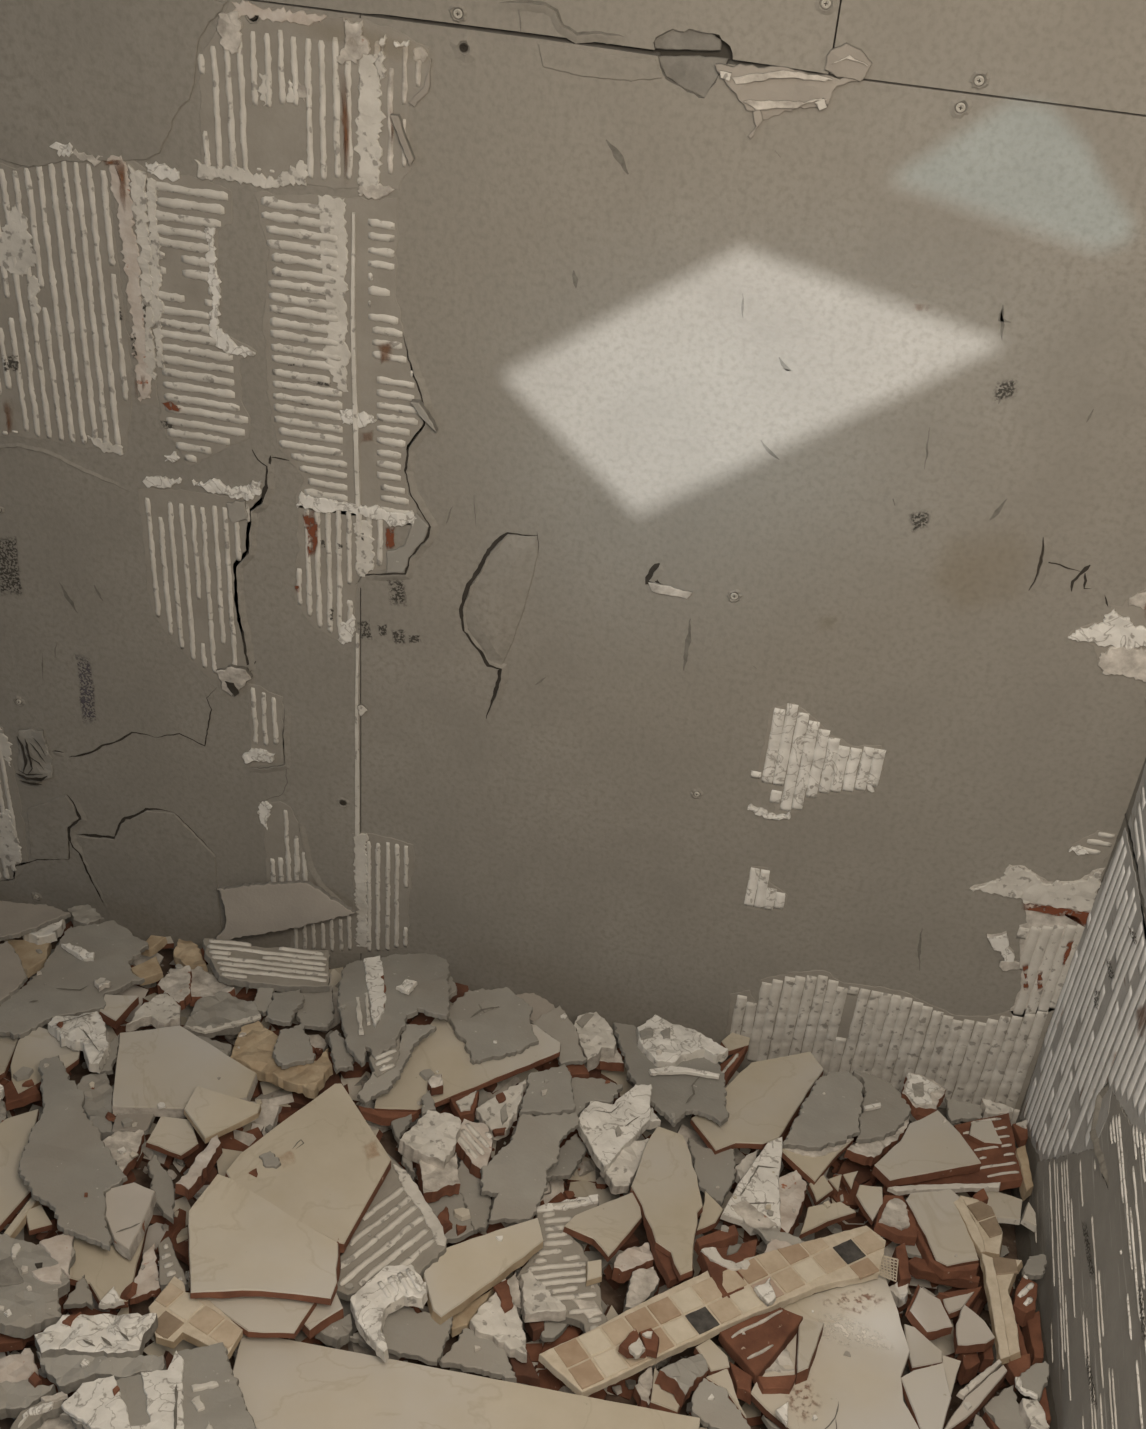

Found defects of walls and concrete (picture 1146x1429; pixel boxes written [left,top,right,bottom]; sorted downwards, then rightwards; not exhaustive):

peeling [0,0,228,168]
crack [233,447,290,672]
peeling [386,512,429,573]
crack [459,532,539,721]
crack [52,692,212,757]
crack [3,793,209,907]
peeling [987,931,1020,971]
peeling [863,1103,881,1111]